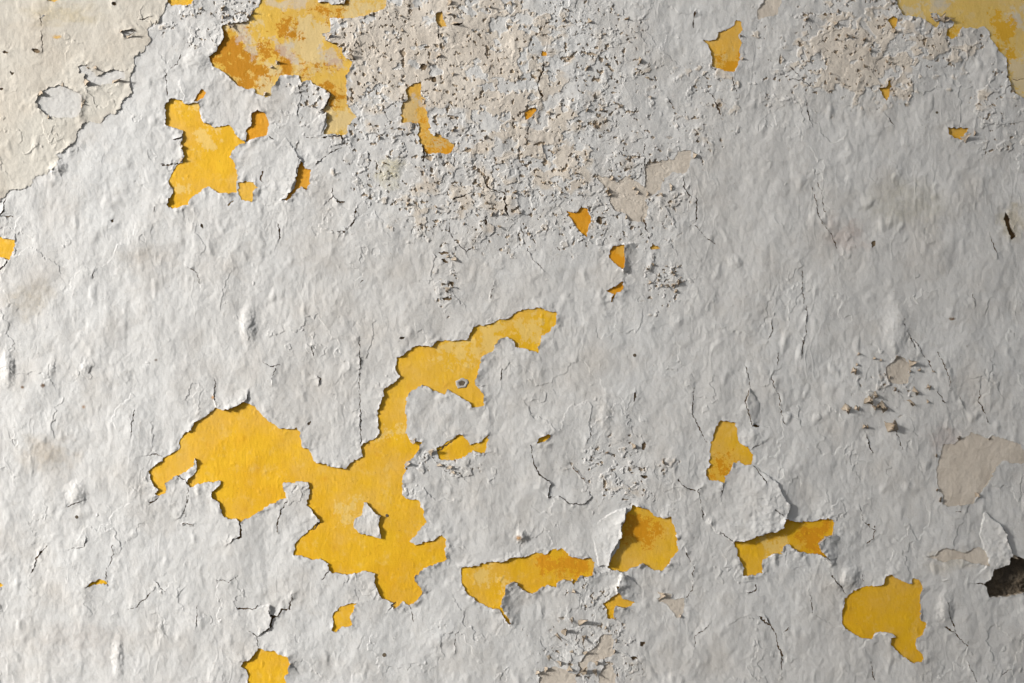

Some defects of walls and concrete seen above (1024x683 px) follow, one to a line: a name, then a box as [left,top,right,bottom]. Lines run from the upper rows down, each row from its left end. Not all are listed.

peeling [703,20,744,72]
peeling [774,0,1024,111]
peeling [0,0,698,303]
crack [812,183,837,248]
peeling [148,307,557,609]
crack [530,445,592,505]
peeling [700,420,844,576]
peeling [936,432,1024,507]
peeling [461,437,679,683]
spalling [928,513,1024,598]
peeling [241,594,302,683]
peeling [842,575,927,664]